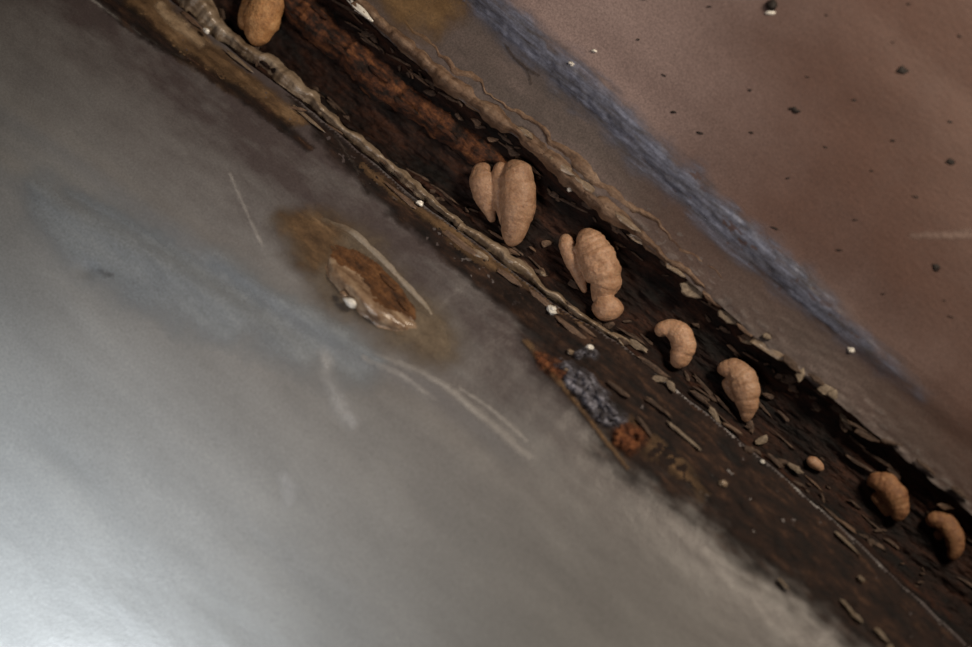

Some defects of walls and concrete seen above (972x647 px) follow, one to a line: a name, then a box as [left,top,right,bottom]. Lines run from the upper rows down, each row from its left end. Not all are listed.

corrosion [99,0,550,325]
corrosion [280,212,454,361]
peeling [177,0,676,392]
peeling [347,0,838,400]
water stain [470,0,839,332]
peeling [645,396,702,451]
corrosion [504,294,968,647]
peeling [689,390,804,474]
peeling [840,599,863,623]
peeling [840,414,902,446]